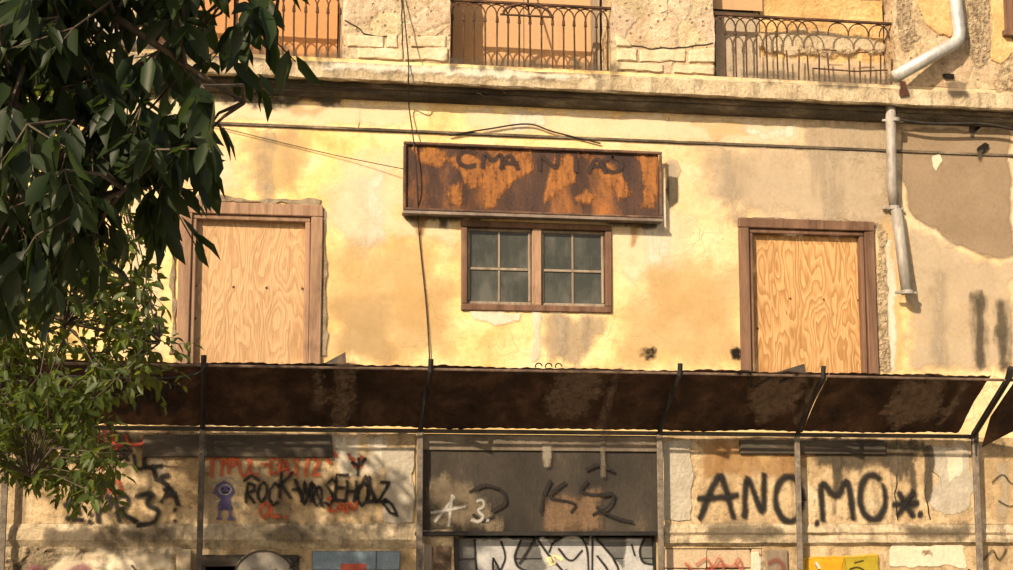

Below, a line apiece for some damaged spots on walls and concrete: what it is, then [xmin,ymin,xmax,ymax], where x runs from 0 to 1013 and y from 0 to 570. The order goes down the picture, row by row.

flaking render [757,28,886,84]
flaking render [896,0,953,51]
flaking render [965,0,1013,92]
water stain [124,97,180,116]
water stain [215,99,406,126]
water stain [219,147,237,188]
flaking render [932,154,942,170]
water stain [125,232,159,336]
corrosion [315,360,354,428]
corrosion [547,369,622,418]
corrosion [751,374,819,421]
corrosion [883,377,965,427]